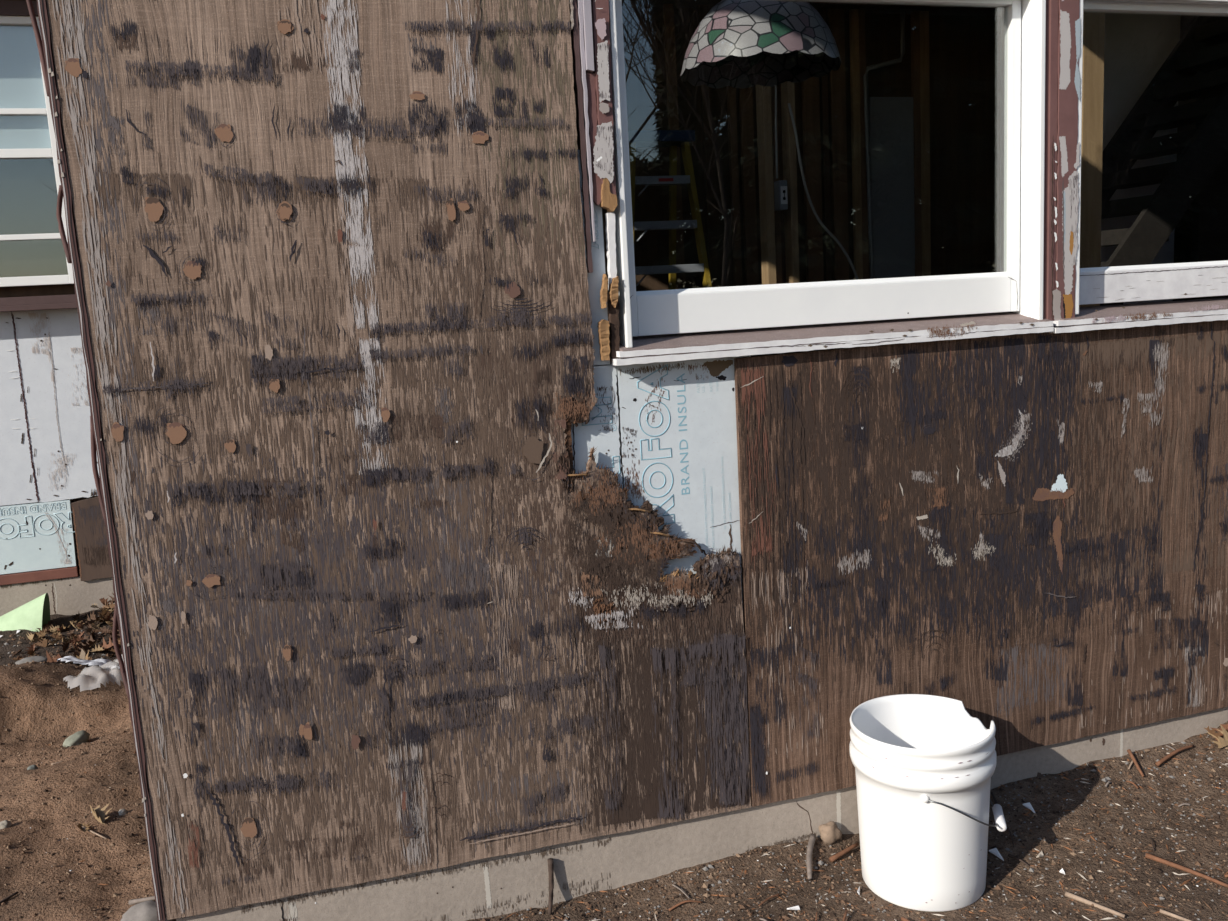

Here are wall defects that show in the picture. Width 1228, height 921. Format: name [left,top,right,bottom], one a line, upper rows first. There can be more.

peeling [593,18,614,183]
peeling [1059,0,1081,100]
peeling [1052,136,1080,321]